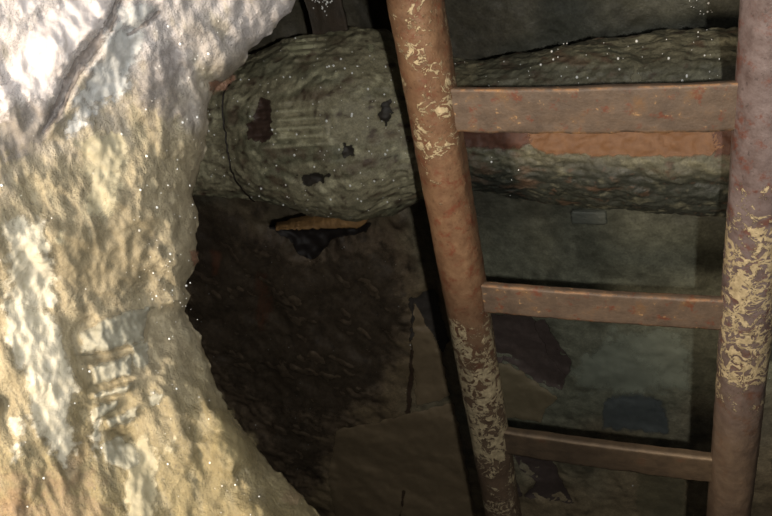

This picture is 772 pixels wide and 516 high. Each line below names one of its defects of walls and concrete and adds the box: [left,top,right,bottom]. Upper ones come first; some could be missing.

spalling [246,97,273,143]
spalling [269,222,371,260]
leakage [0,216,79,468]
crack [405,341,414,414]
spalling [491,314,572,423]
leakage [572,326,689,434]